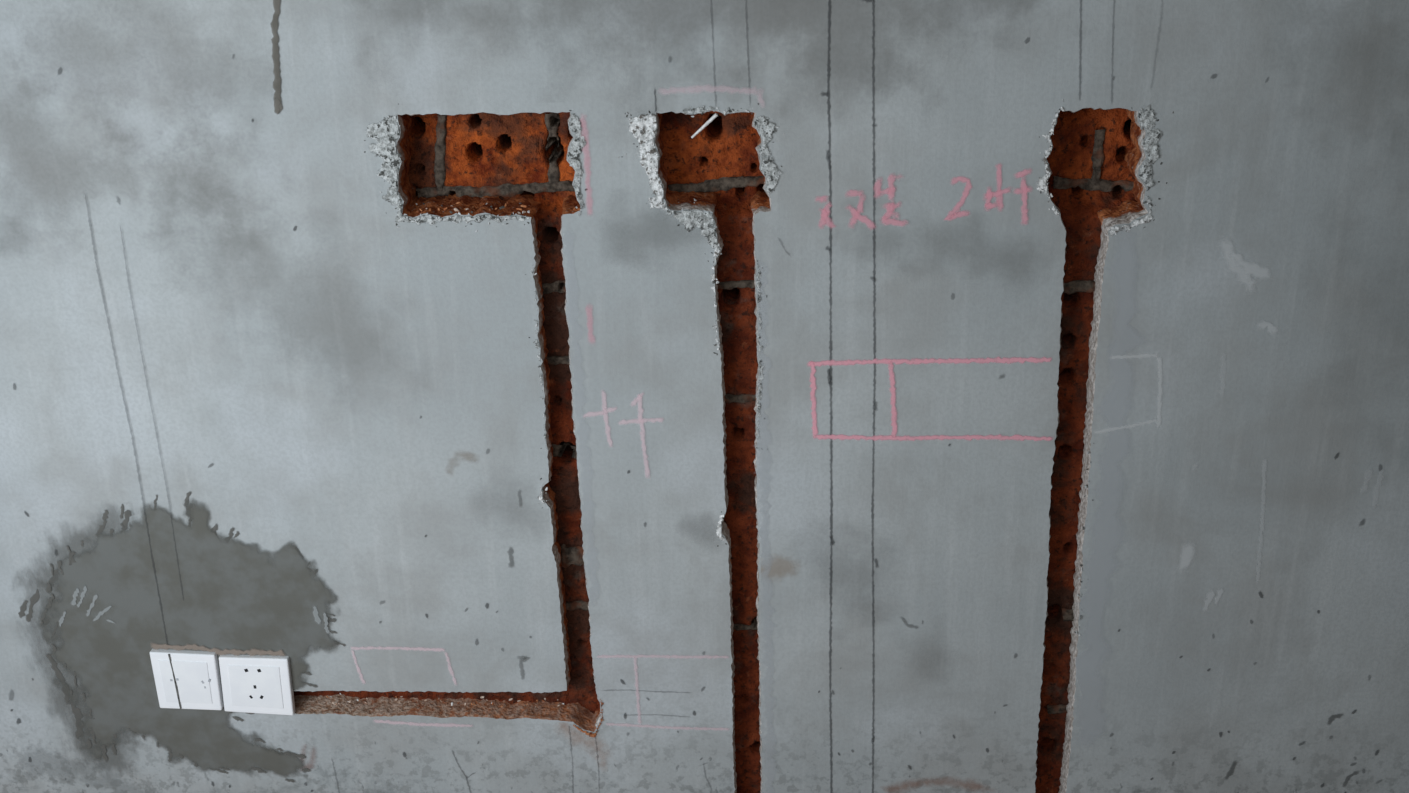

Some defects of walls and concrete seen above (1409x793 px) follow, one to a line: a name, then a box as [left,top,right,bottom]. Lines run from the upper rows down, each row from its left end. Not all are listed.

spalling [294,104,603,738]
spalling [618,103,784,793]
spalling [1037,99,1174,793]